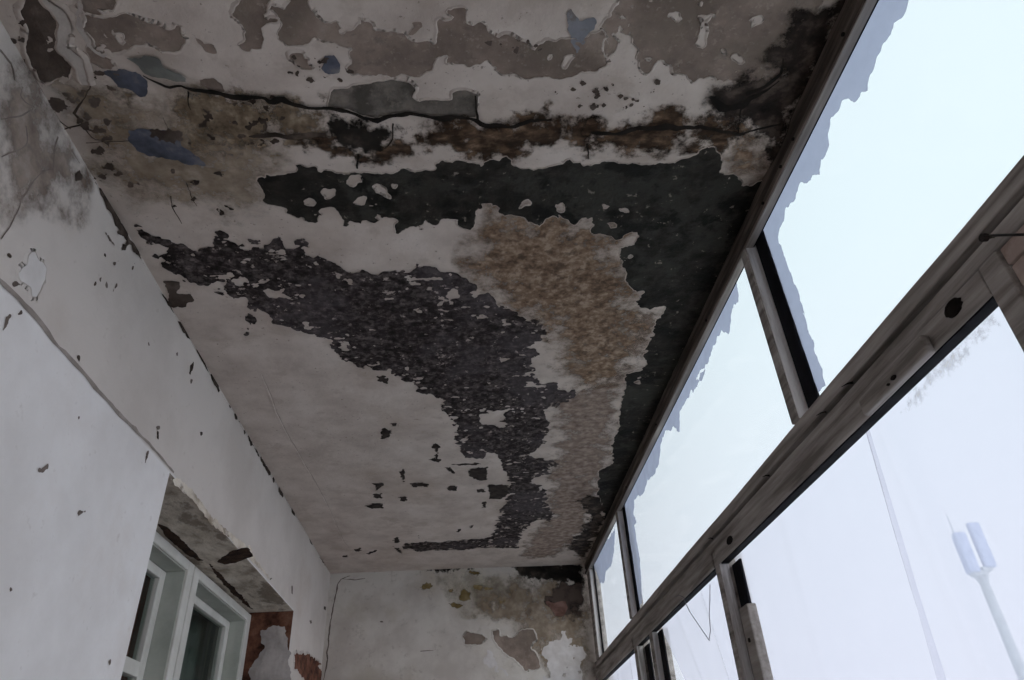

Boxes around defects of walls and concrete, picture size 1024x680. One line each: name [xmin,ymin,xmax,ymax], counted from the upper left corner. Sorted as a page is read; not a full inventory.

water stain [0,62,75,216]
peeling [10,0,217,188]
peeling [200,78,225,92]
peeling [232,95,285,146]
crack [143,75,552,149]
peeling [228,0,824,119]
crack [586,58,784,159]
peeling [3,248,48,330]
water stain [51,0,846,673]
spalling [171,478,272,580]
flaking render [293,649,322,680]
flaking render [462,628,588,680]